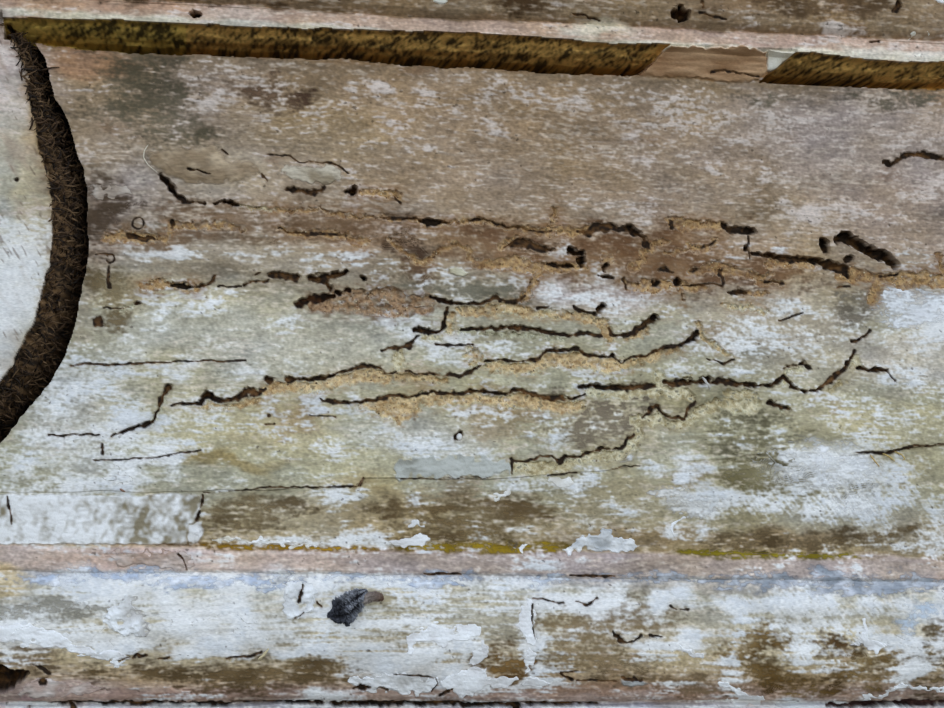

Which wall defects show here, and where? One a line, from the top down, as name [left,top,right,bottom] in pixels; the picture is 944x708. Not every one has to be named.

crack [882,150,944,167]
crack [457,325,603,342]
crack [850,329,872,343]
crack [48,359,247,462]
crack [766,400,791,416]
crack [856,444,944,456]
peeling [562,528,637,556]
spalling [282,581,318,620]
peeling [0,623,129,668]
peeling [347,598,551,698]
spalling [18,678,104,698]
peeling [862,683,944,701]